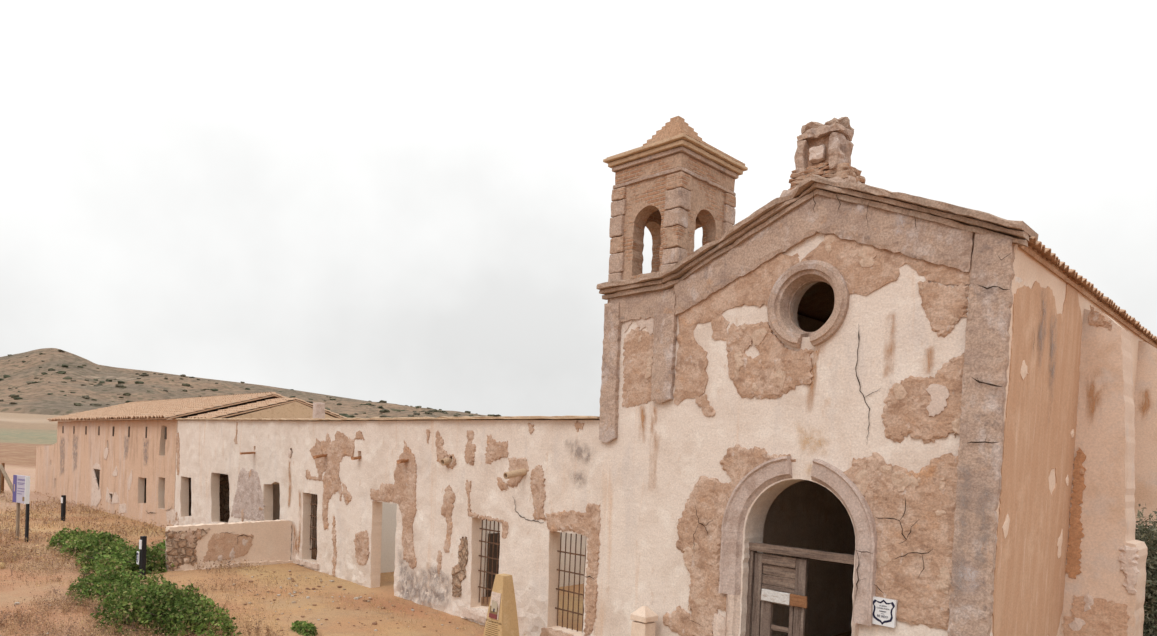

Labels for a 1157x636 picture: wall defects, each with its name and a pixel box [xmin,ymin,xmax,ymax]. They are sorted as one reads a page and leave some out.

peeling [165,467,265,571]
peeling [305,430,365,577]
peeling [370,440,417,569]
peeling [426,429,601,636]
peeling [622,317,654,408]
peeling [663,444,796,636]
peeling [673,234,972,416]
crack [855,332,878,436]
peeling [843,452,959,630]
peeling [881,353,964,443]
peeling [992,276,1130,636]